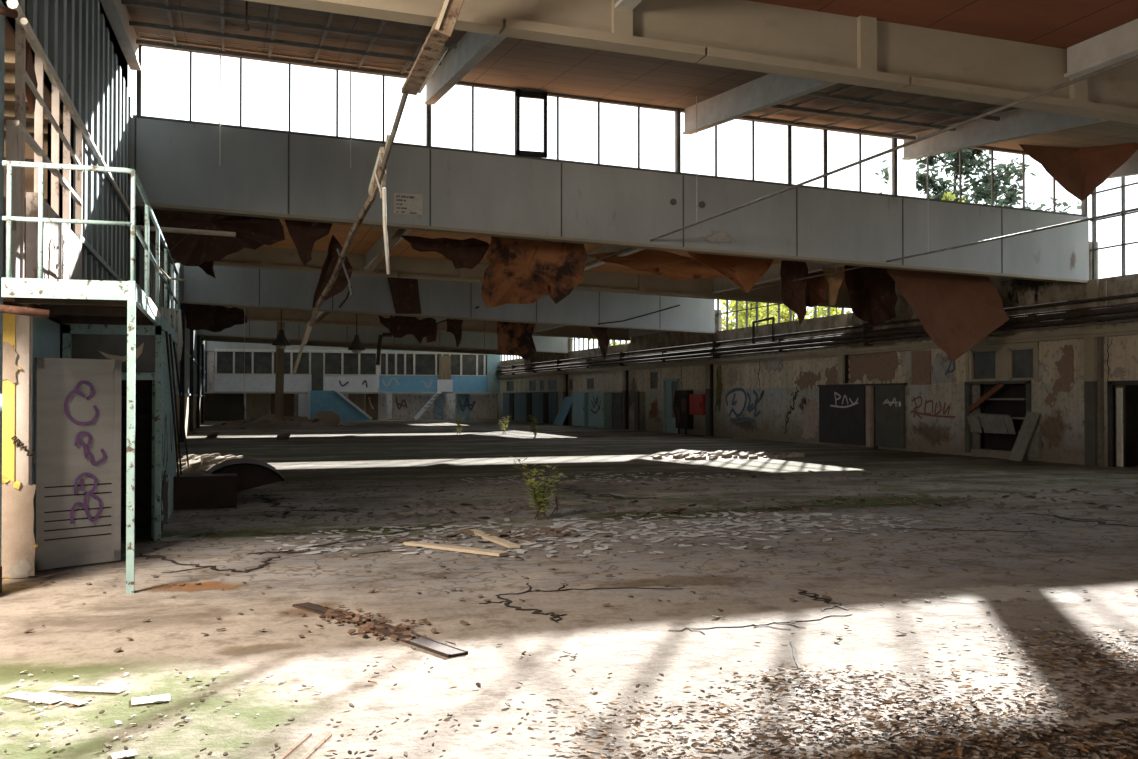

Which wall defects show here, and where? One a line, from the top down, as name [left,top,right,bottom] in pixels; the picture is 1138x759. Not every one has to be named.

peeling [1044,344,1075,408]
crack [479,583,683,622]